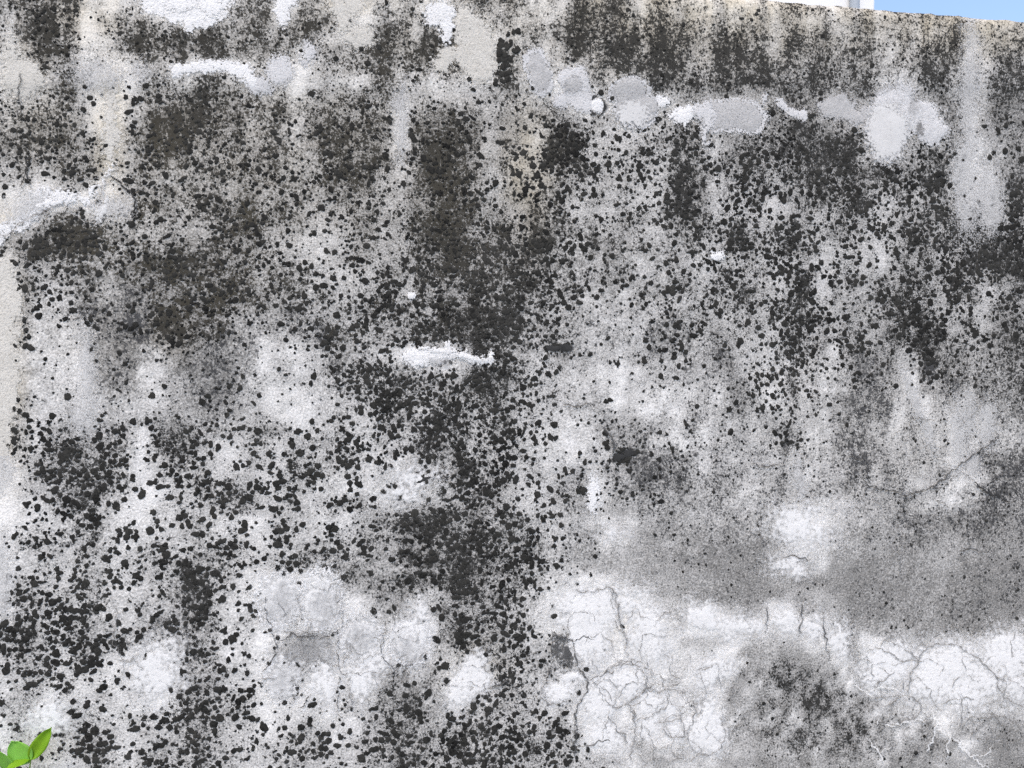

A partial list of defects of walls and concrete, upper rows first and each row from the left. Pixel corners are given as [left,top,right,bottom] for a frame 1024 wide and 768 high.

spalling [398,340,496,370]
water stain [263,628,301,668]
crack [452,587,746,766]
water stain [711,552,764,604]
crack [799,605,830,661]
water stain [724,634,955,768]
water stain [830,540,934,637]
crack [857,631,1024,765]